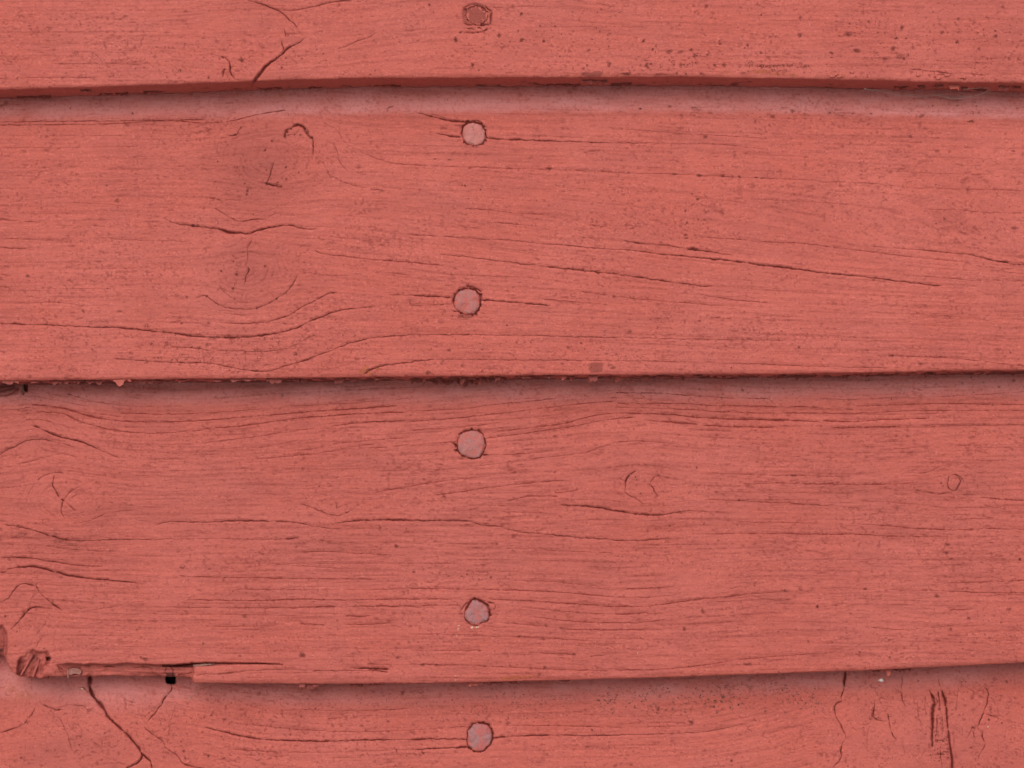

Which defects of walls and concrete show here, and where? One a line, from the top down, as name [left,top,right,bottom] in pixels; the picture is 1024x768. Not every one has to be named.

crack [222,0,347,87]
crack [82,662,283,768]
crack [834,671,846,764]
crack [930,691,953,768]